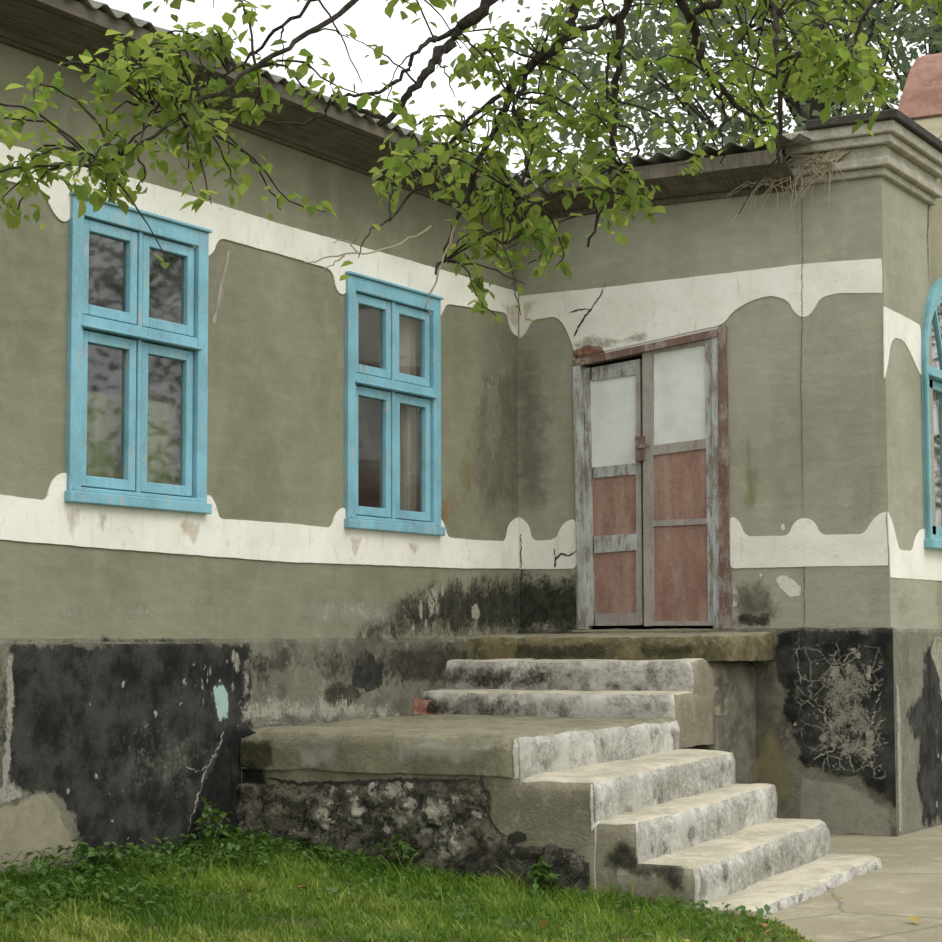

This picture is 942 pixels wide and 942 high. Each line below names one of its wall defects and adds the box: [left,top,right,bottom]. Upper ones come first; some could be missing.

crack [517,534,525,625]
crack [554,549,576,567]
peeling [776,575,801,597]
crack [186,732,224,835]
water stain [0,573,605,864]
crack [796,638,888,773]
water stain [908,640,942,826]